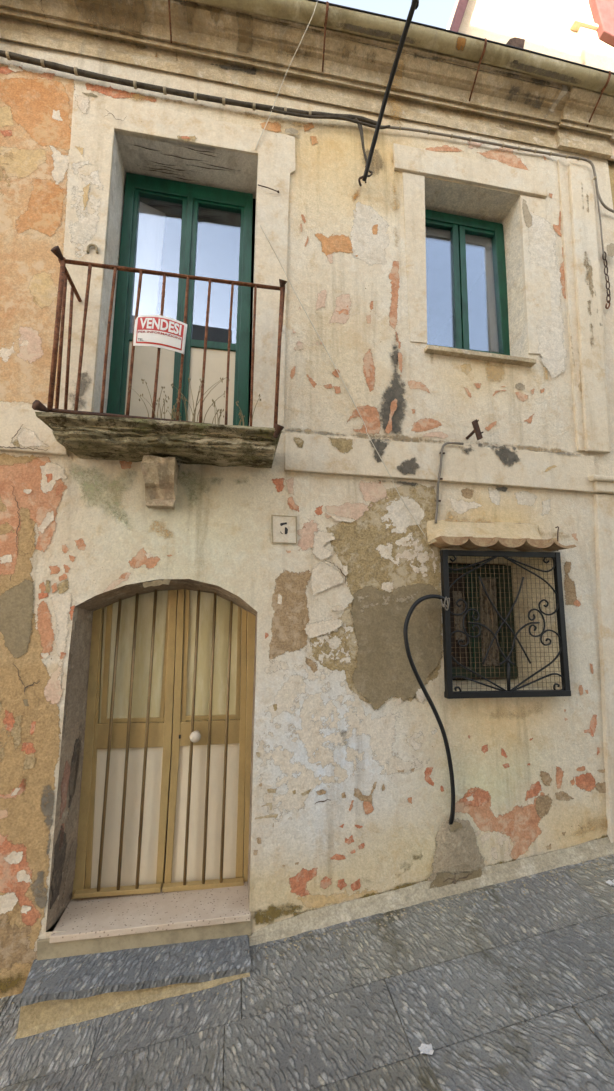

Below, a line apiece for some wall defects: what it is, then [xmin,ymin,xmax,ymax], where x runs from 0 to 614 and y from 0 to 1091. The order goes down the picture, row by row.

damp [75,0,157,57]
damp [182,0,221,24]
damp [236,12,253,53]
damp [211,64,256,74]
peeling [260,122,318,145]
peeling [0,63,157,406]
peeling [300,214,358,264]
damp [287,346,444,462]
spalling [255,478,500,860]
spalling [0,427,91,998]
peeling [430,763,606,888]
peeling [282,862,378,909]